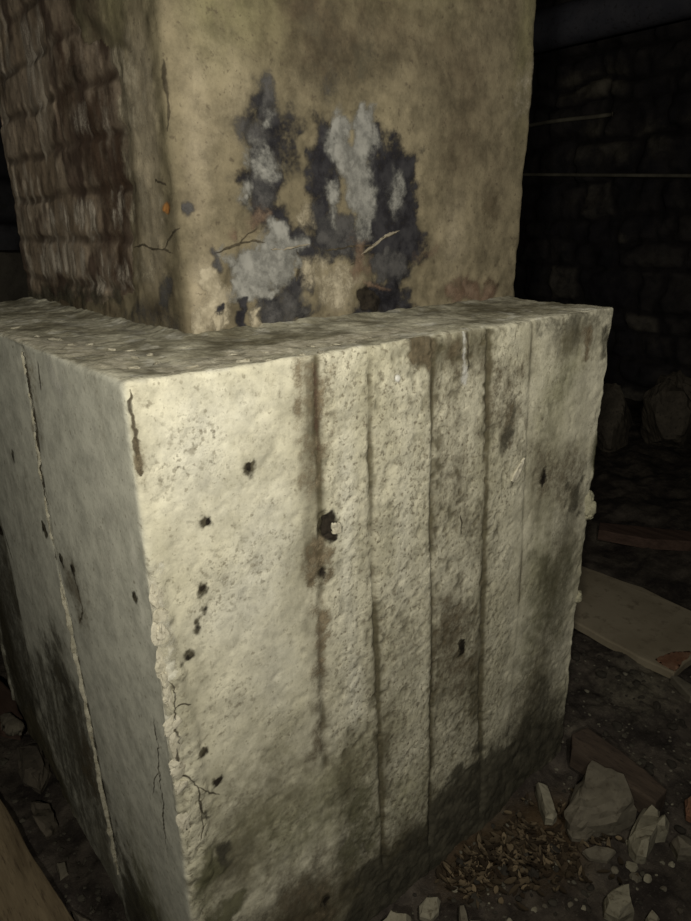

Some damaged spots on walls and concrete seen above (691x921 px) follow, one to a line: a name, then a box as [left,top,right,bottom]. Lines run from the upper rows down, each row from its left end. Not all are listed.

peeling [239,140,280,205]
peeling [324,103,380,243]
peeling [390,175,404,210]
crack [133,228,180,253]
crack [216,227,265,253]
peeling [193,217,407,334]
damp [0,546,113,832]
crack [152,681,220,845]
damp [339,691,565,921]
damp [195,841,231,890]
damp [206,889,246,921]